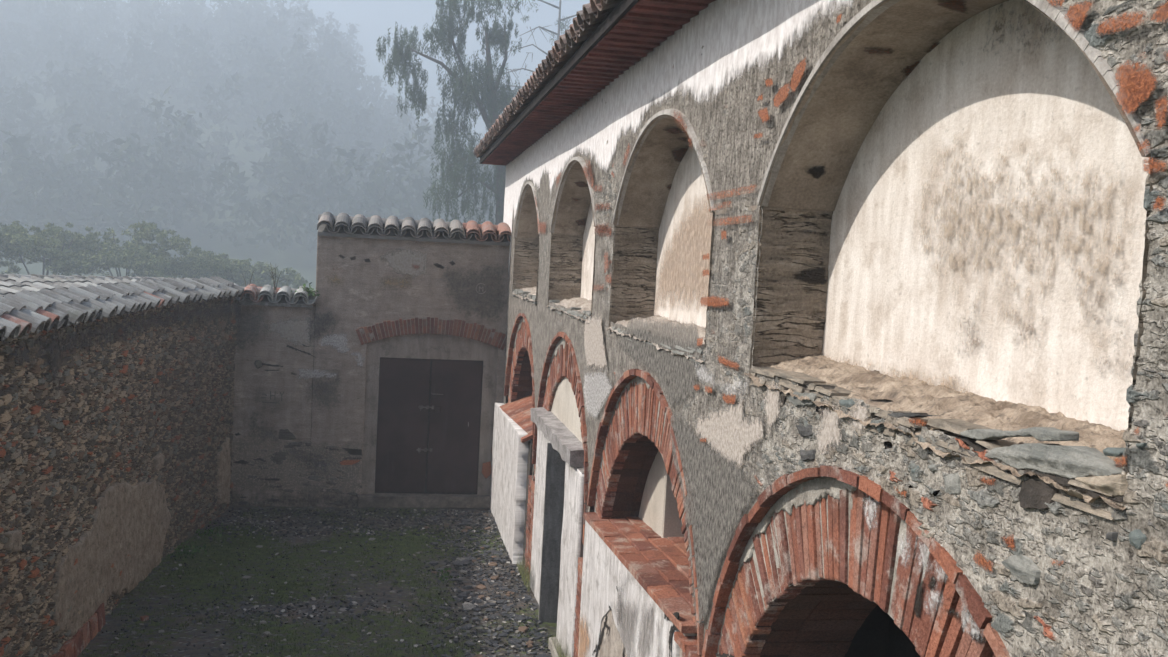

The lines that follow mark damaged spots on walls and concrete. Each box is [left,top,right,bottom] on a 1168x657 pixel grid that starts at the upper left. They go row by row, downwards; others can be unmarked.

flaking render [754,59,806,138]
flaking render [663,112,690,162]
flaking render [808,166,825,179]
leakage [923,148,1121,321]
spalling [888,412,938,430]
spalling [960,427,1147,510]
peeling [51,453,171,637]
spalling [973,535,1063,585]
spalling [1106,529,1147,549]
crack [592,586,618,657]